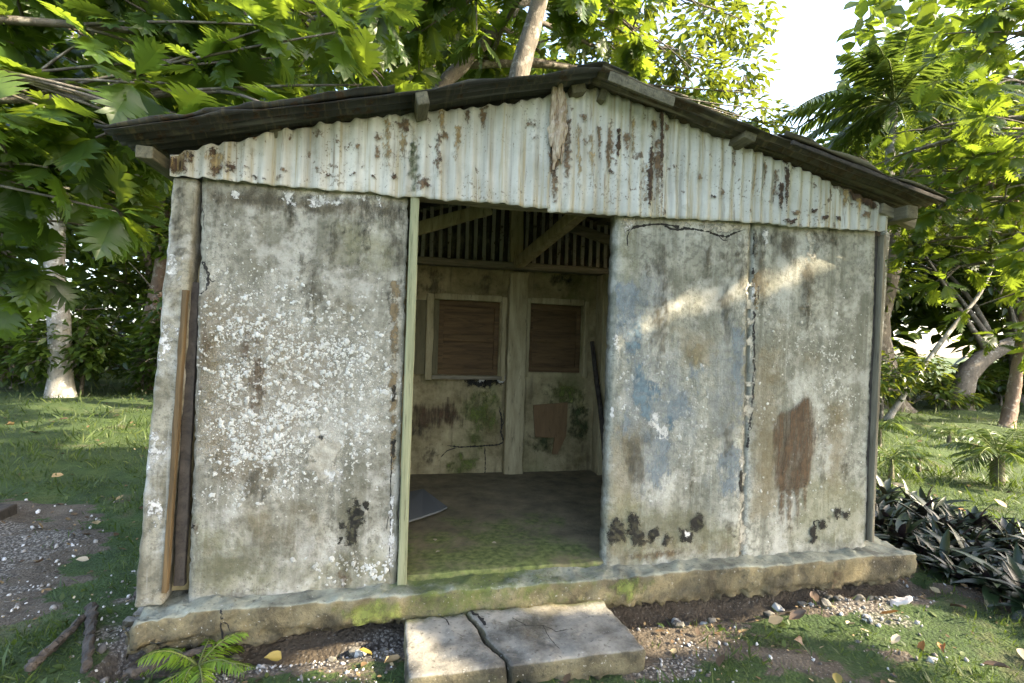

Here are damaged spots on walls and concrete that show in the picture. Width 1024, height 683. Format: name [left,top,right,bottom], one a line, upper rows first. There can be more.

rust [170,147,288,180]
rust [374,118,410,180]
rust [547,114,635,203]
rust [643,112,669,205]
rust [753,159,878,224]
crack [626,223,759,448]
crack [441,406,504,473]
damp [337,498,369,546]
damp [606,512,704,559]
damp [810,508,851,544]